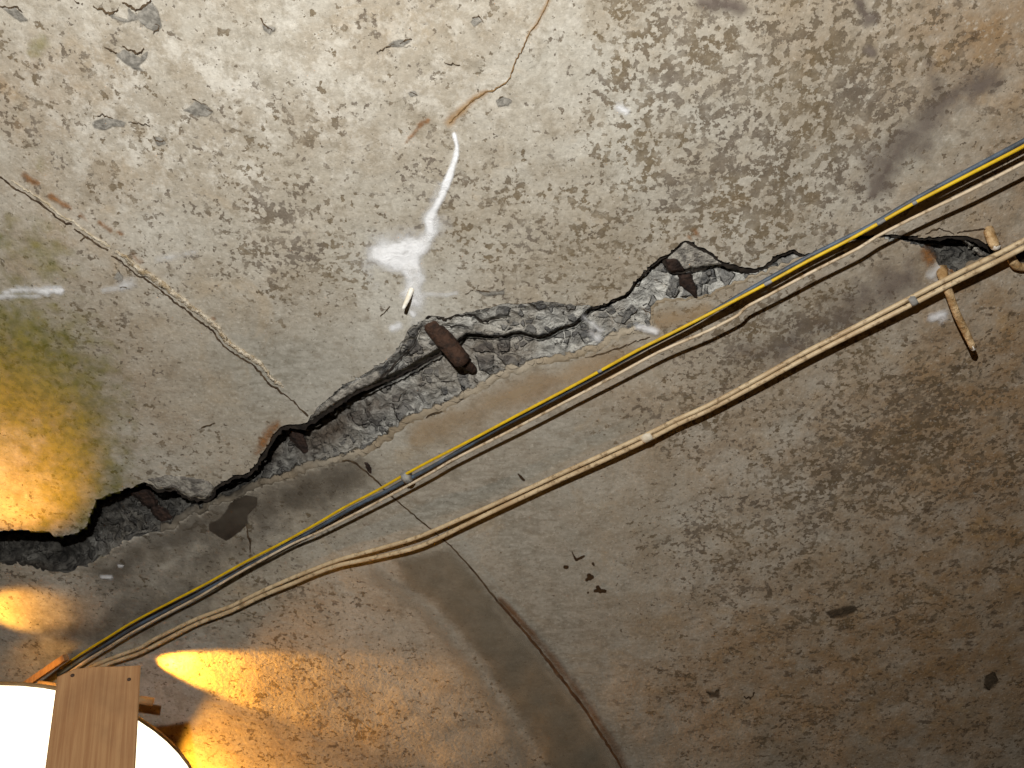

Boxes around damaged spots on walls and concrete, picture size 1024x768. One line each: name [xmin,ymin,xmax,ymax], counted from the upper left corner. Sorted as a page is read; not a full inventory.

crack [449,0,549,124]
damp [369,132,459,317]
rust [663,257,698,298]
rust [130,488,172,522]
crack [0,176,995,768]